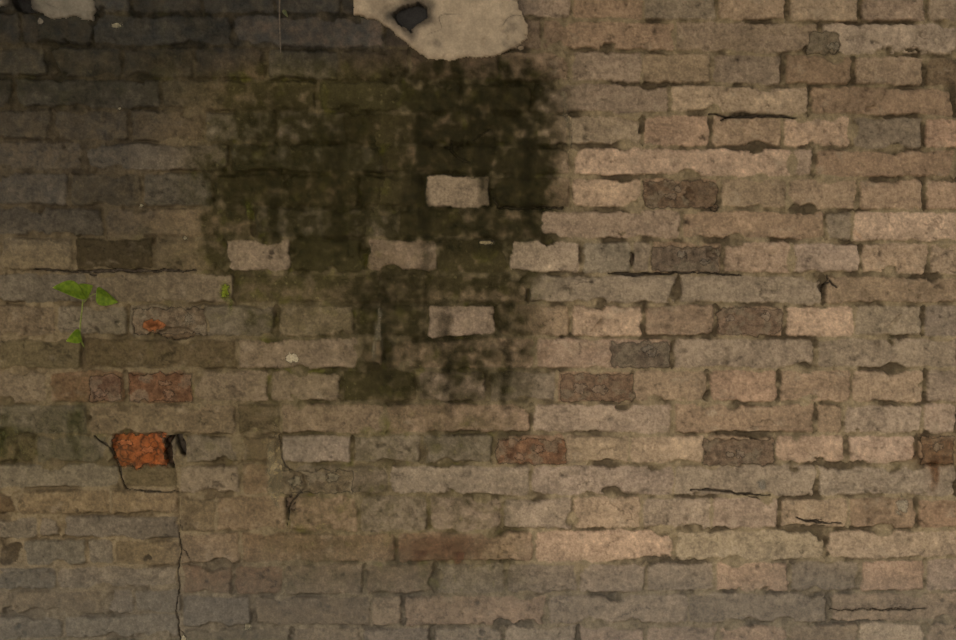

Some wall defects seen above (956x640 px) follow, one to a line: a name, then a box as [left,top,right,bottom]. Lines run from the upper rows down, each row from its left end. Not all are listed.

crack [176,524,189,640]